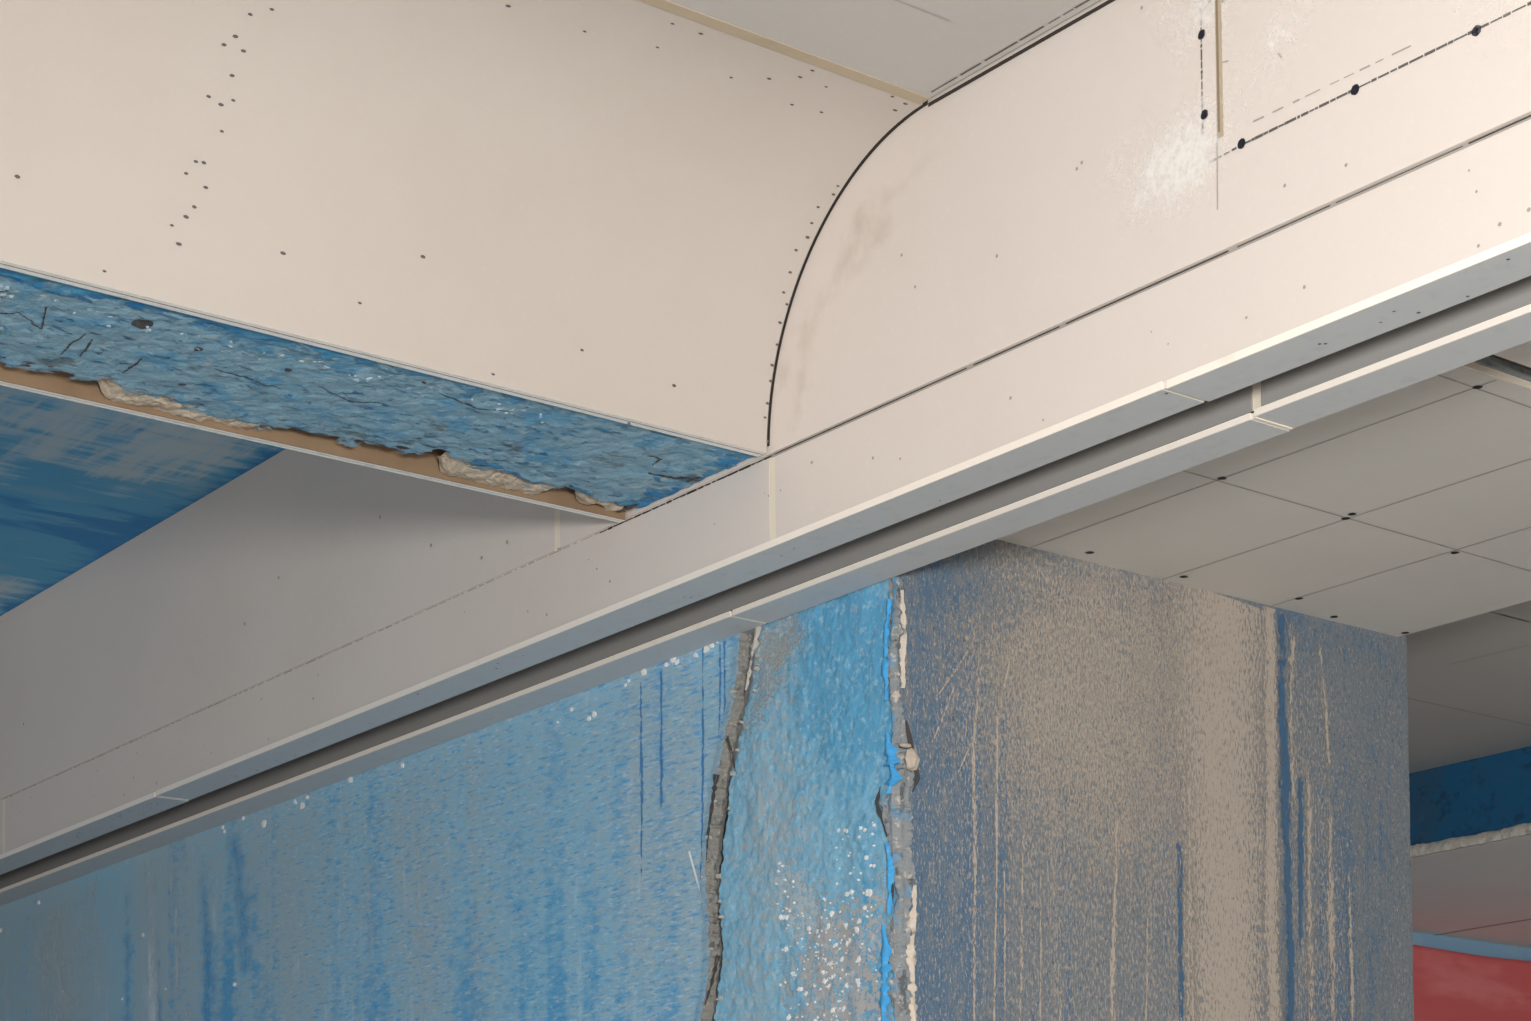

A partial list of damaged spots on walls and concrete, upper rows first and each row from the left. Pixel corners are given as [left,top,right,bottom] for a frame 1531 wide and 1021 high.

peeling [0,276,745,504]
crack [700,626,761,1021]
spalling [770,574,921,1021]